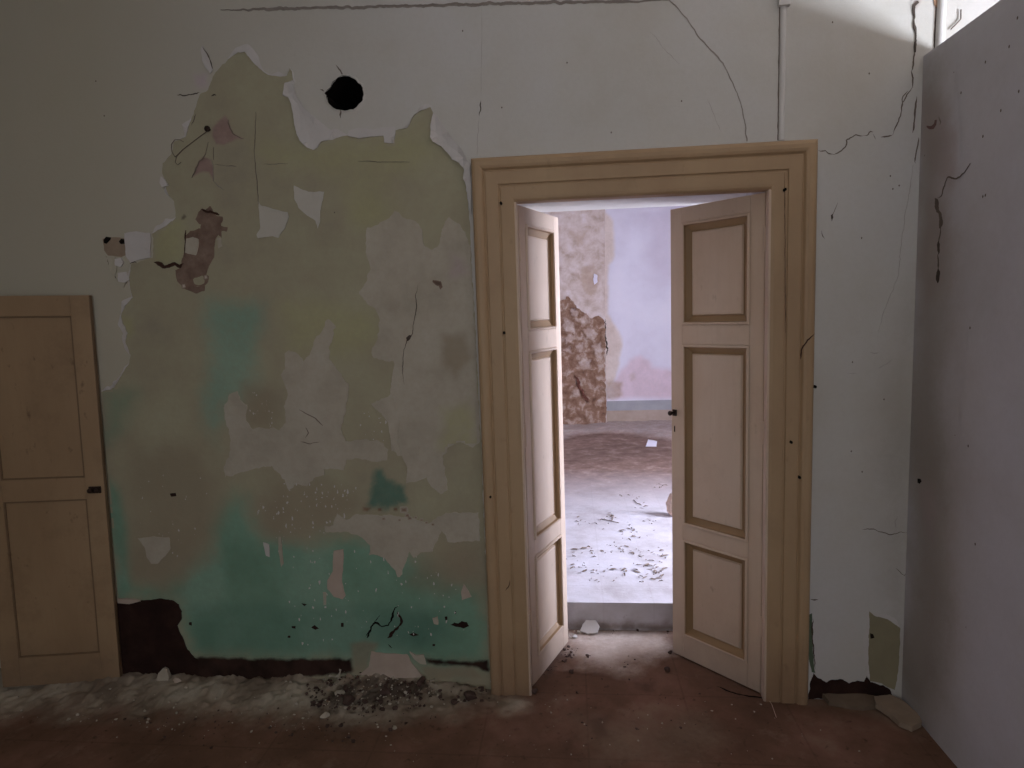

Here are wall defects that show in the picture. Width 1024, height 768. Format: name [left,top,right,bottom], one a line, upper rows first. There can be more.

crack [225,0,748,153]
flaking render [171,114,245,189]
crack [820,1,937,331]
flaking render [103,237,136,288]
flaking render [154,206,228,294]
crack [935,164,970,283]
flaking render [560,209,624,425]
flaking render [117,598,198,676]
crack [366,606,403,648]
peeling [808,611,900,699]